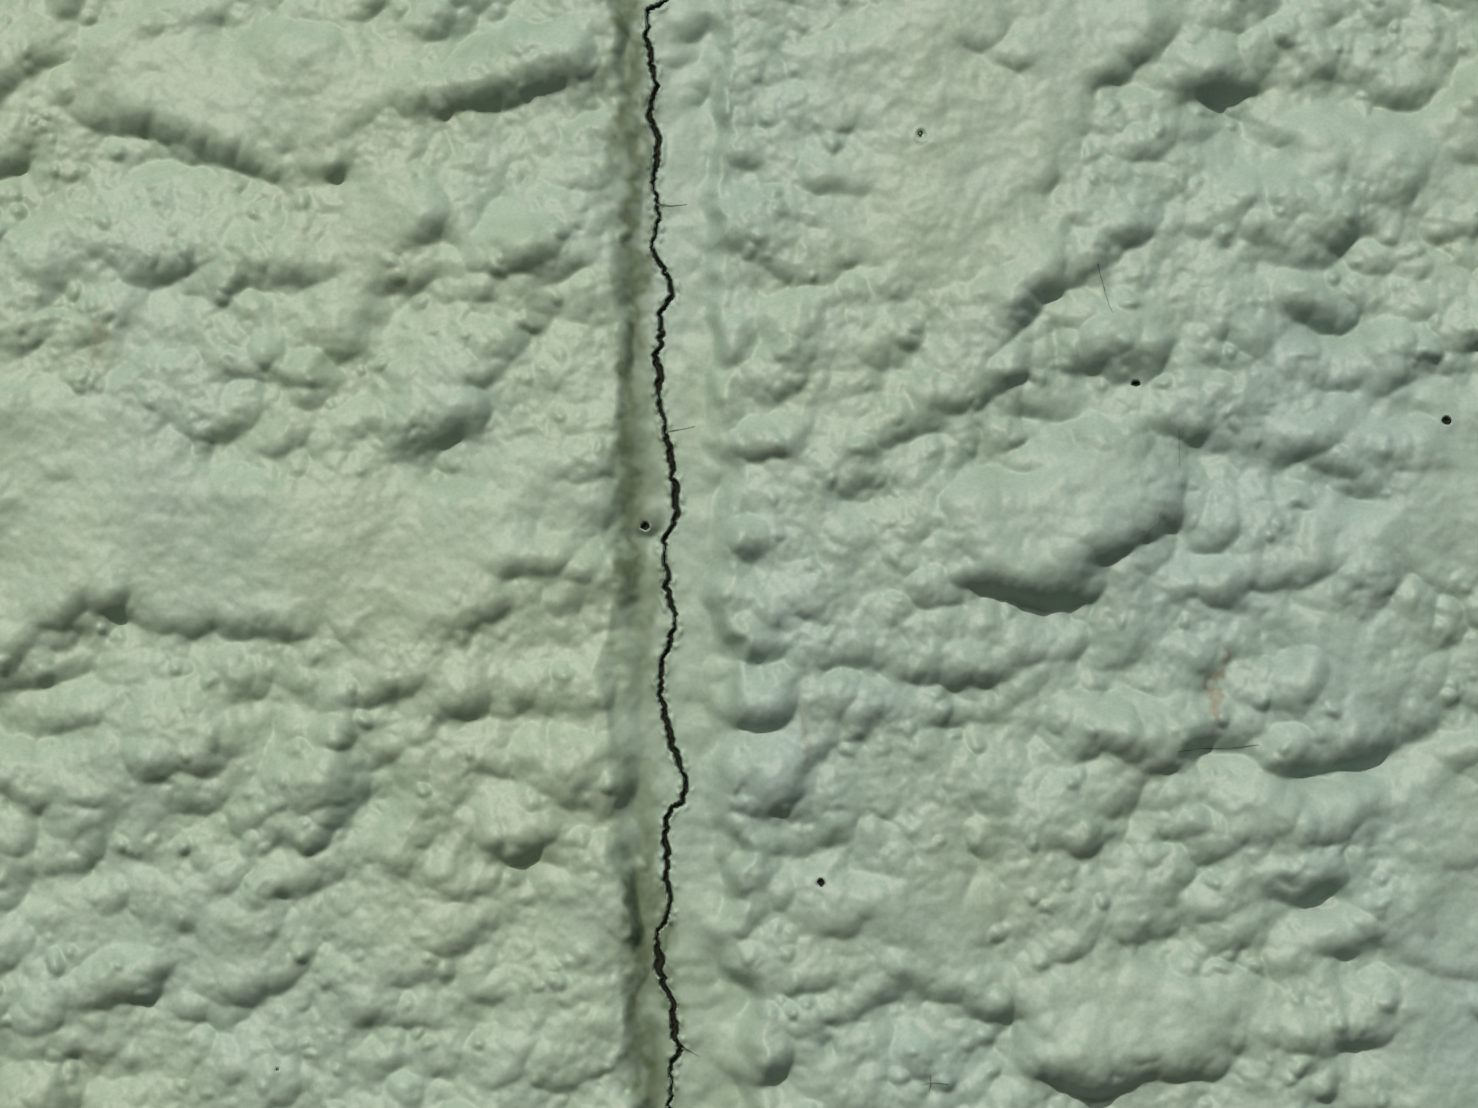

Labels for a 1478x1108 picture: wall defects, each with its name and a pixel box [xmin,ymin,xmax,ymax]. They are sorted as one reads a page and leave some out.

crack [644,0,698,1108]